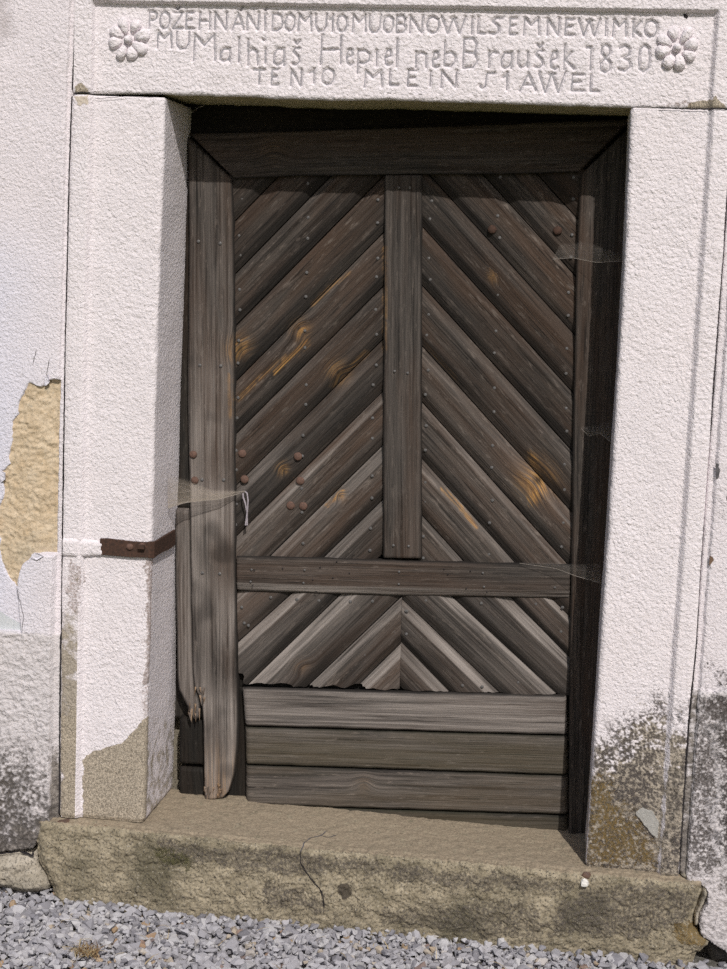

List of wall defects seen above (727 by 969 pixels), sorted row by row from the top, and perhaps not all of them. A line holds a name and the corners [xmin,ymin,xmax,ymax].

flaking render [0,375,61,586]
water stain [0,755,31,825]
water stain [157,662,727,941]